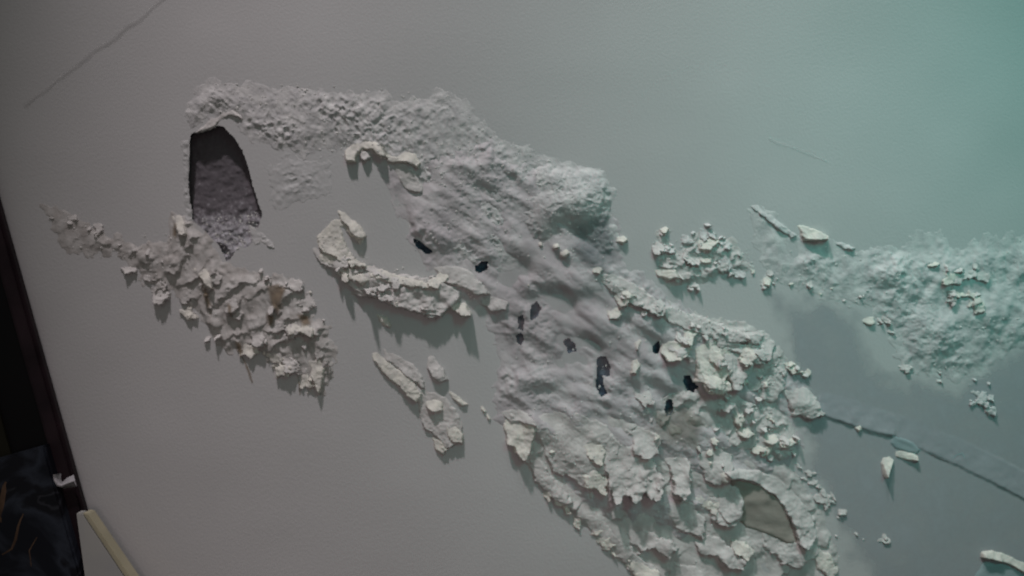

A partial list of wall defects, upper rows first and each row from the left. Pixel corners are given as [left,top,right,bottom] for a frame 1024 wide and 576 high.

peeling [344,141,423,194]
peeling [40,110,338,396]
peeling [313,210,509,328]
peeling [372,223,847,576]
spalling [881,436,920,479]
peeling [975,550,1024,576]